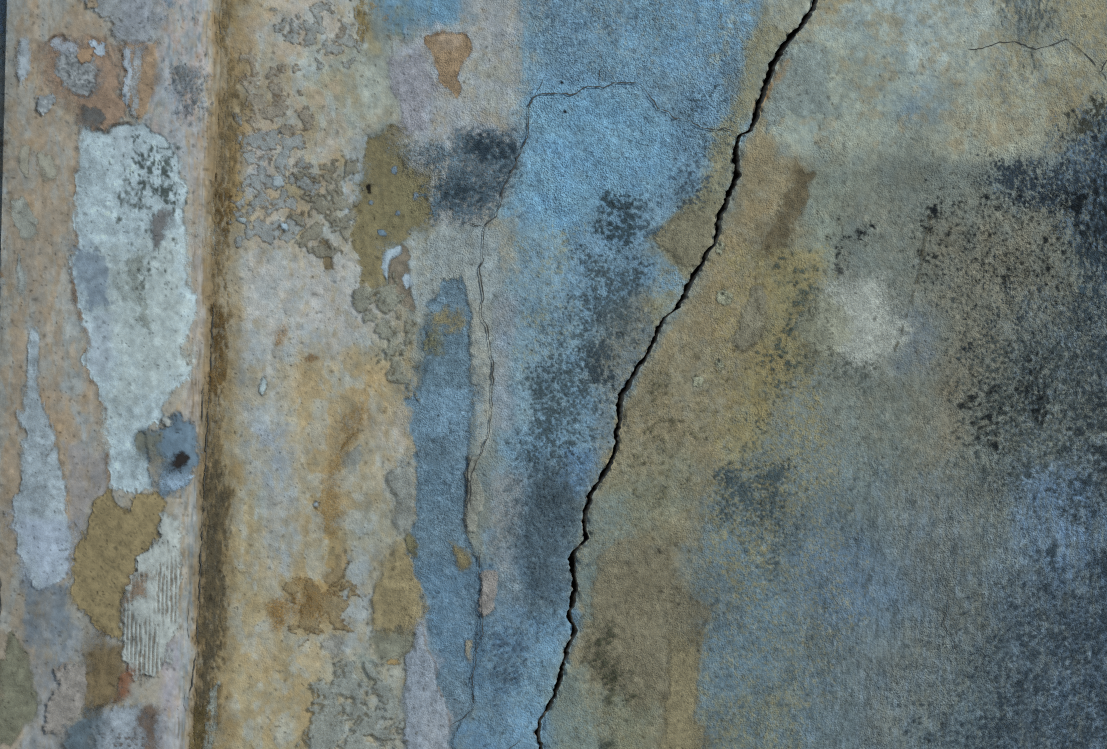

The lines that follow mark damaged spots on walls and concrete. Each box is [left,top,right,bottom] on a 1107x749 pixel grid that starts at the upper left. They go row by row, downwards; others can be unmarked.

peeling [0,0,200,749]
peeling [271,2,364,69]
peeling [229,32,498,749]
crack [451,553,484,745]
crack [461,0,818,749]
leakage [898,93,1107,749]
crack [971,39,1107,80]